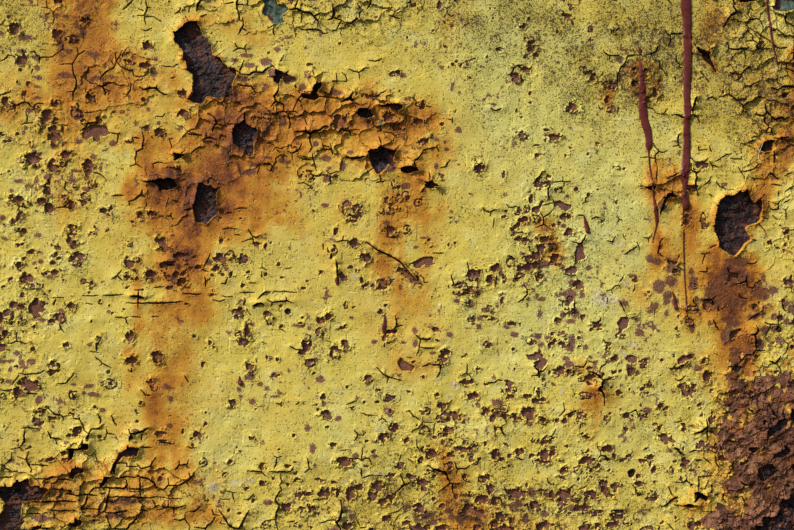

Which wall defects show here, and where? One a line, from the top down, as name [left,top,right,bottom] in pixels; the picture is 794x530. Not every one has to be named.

spalling [164,12,237,118]
spalling [263,0,290,27]
crack [176,0,385,187]
crack [290,0,411,34]
crack [641,0,794,241]
rust [0,0,471,530]
crack [366,242,426,286]
rust [610,38,794,530]
spalling [701,179,770,256]
spalling [0,472,93,530]
crack [1,407,252,530]
crack [250,456,311,529]